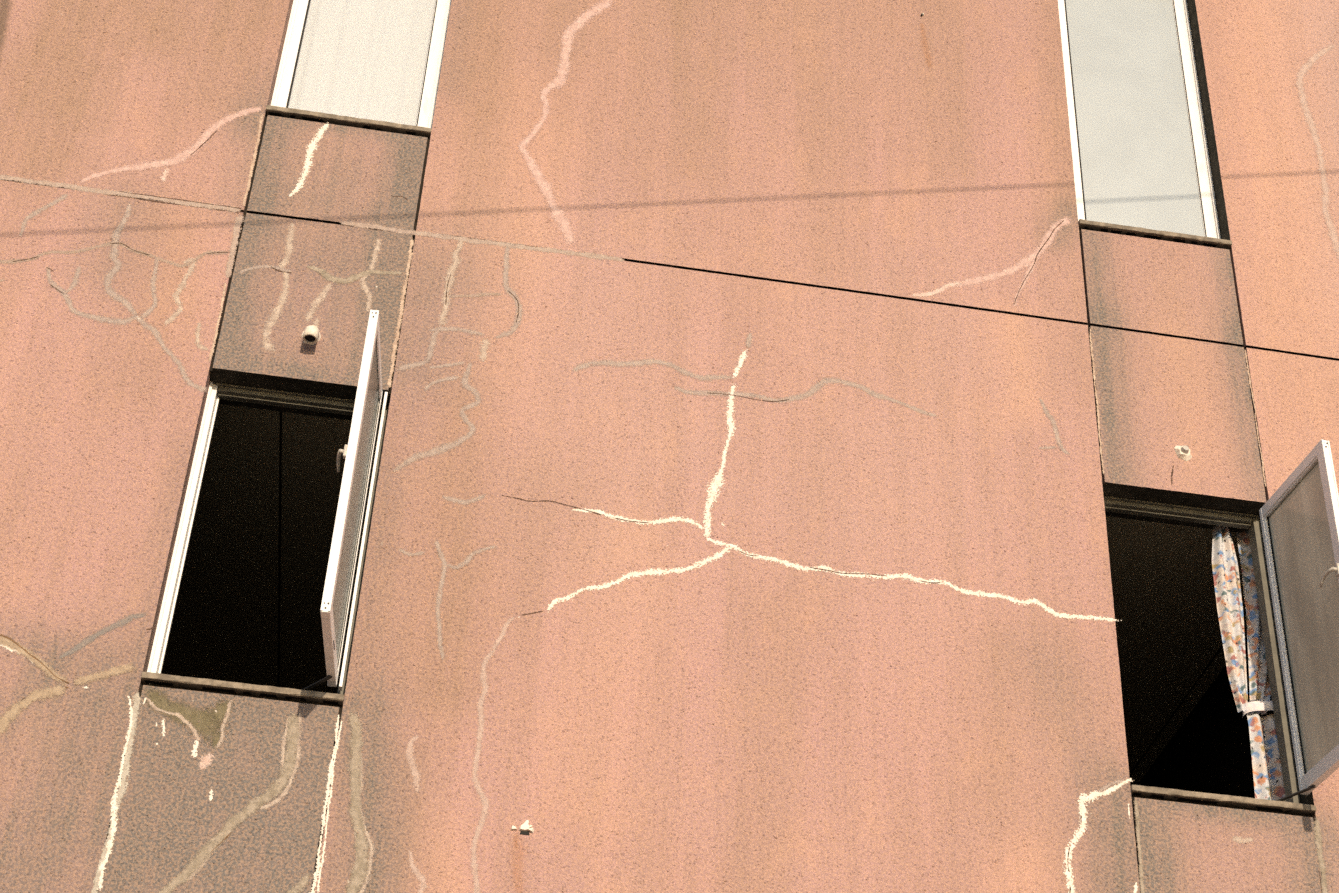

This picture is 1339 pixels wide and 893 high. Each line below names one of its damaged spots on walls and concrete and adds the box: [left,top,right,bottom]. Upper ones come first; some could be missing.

crack [519,0,612,244]
crack [1296,44,1339,258]
crack [0,107,402,392]
crack [912,218,1071,306]
crack [400,541,494,659]
crack [443,333,1122,893]
crack [158,713,302,893]
crack [287,873,309,893]
crack [346,713,374,893]
crack [406,736,421,792]
crack [409,851,427,893]
crack [1062,778,1133,893]